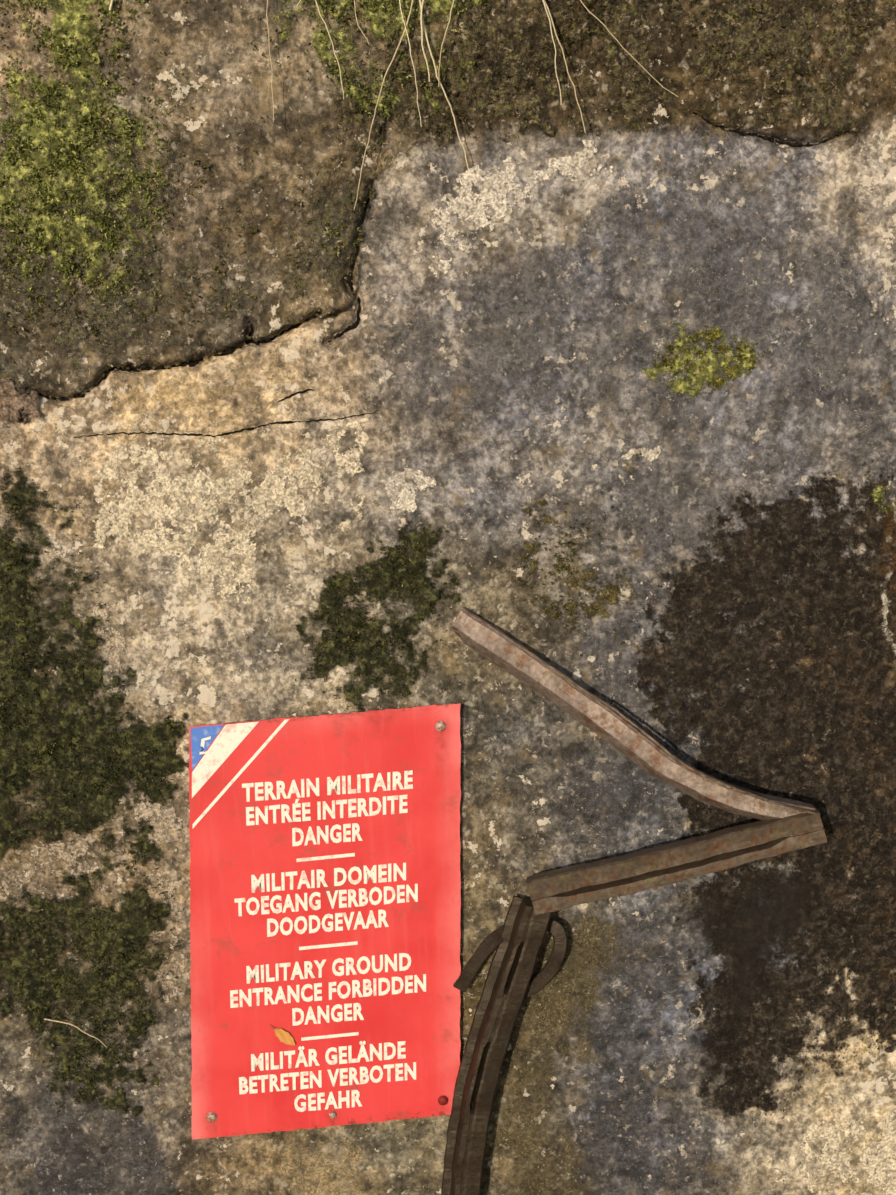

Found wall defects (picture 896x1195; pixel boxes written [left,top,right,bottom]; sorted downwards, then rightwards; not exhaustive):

crack [39,186,372,401]
crack [74,389,379,438]